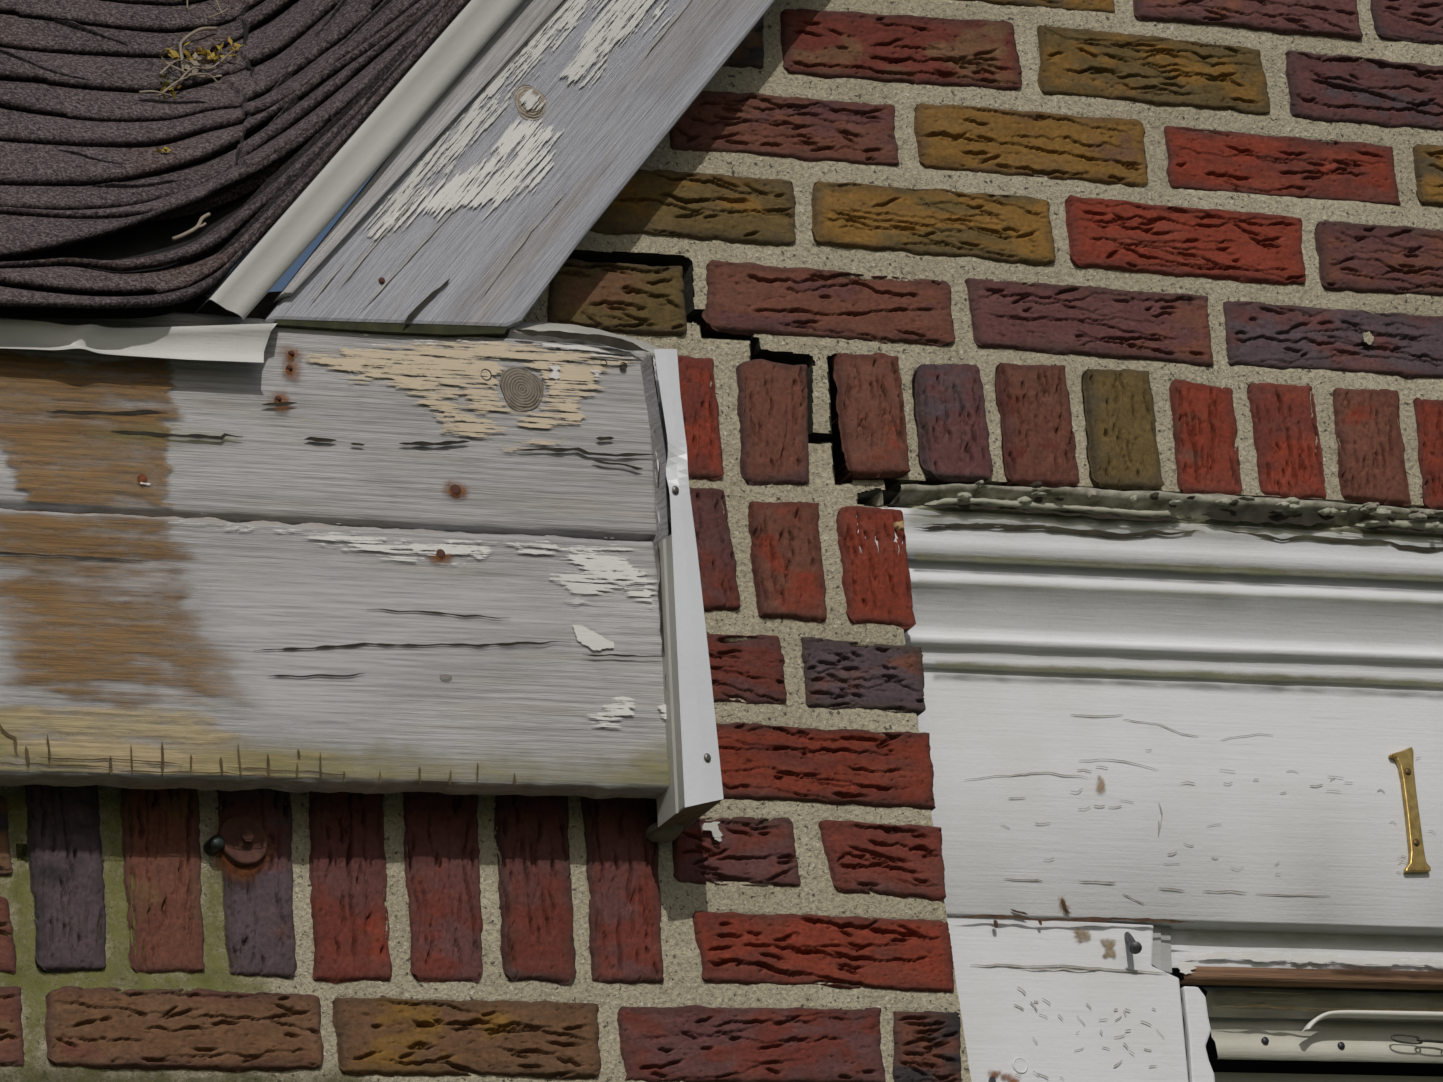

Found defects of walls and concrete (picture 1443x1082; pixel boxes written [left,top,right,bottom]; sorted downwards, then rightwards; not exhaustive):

peeling [360,0,676,240]
crack [46,410,243,440]
leakage [0,353,393,777]
crack [262,400,297,408]
peeling [170,520,657,728]
crack [274,189,660,486]
peeling [303,337,636,453]
peeling [653,358,671,534]
crack [568,250,1443,552]
leakage [0,787,272,1082]